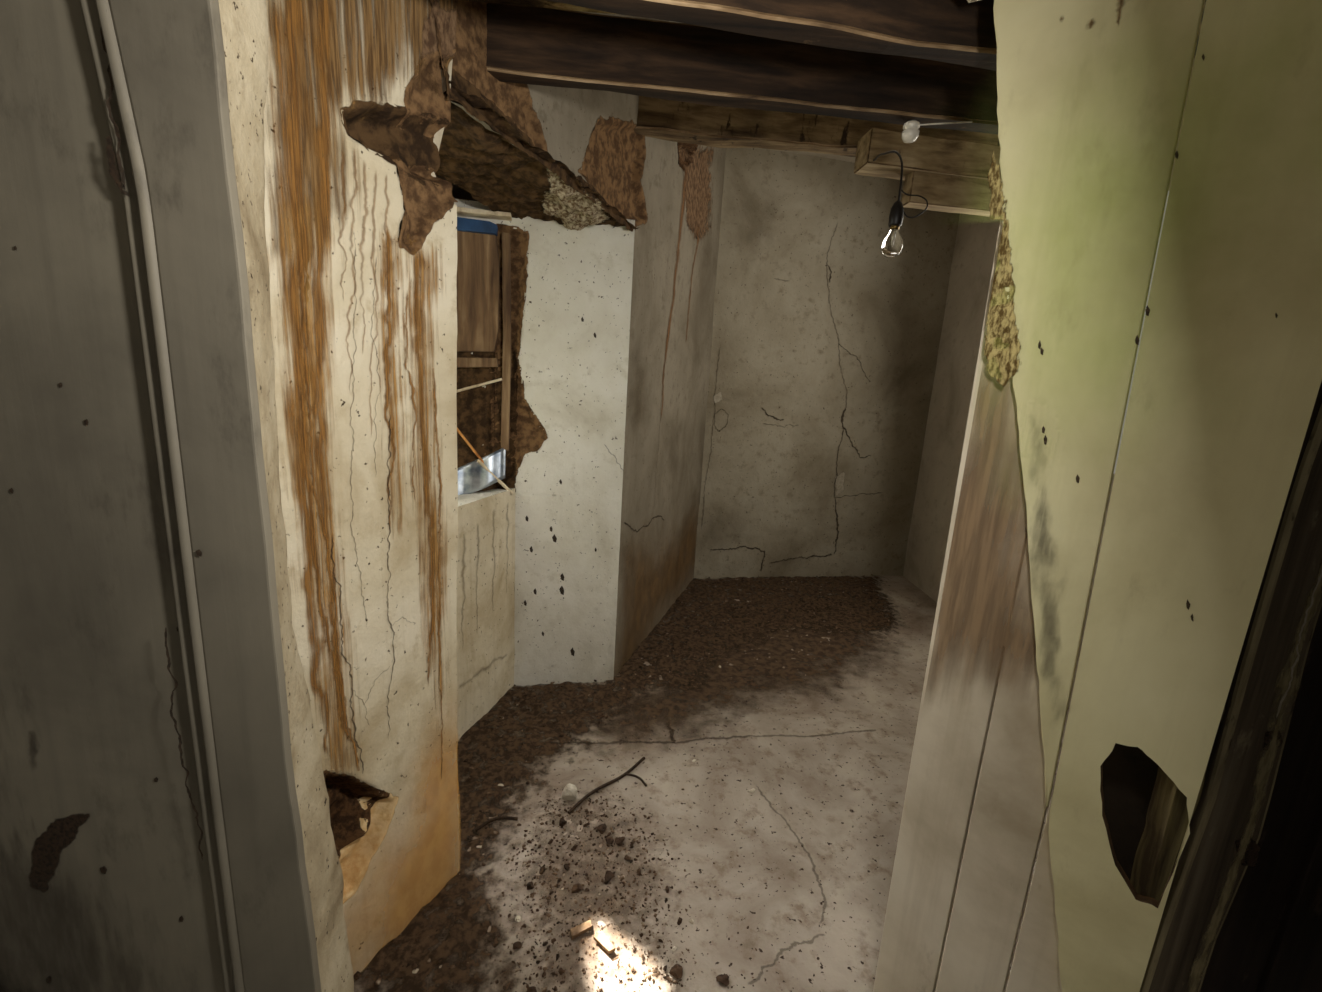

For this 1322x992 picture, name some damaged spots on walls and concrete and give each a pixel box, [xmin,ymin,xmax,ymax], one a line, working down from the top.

corrosion [271,0,359,771]
corrosion [381,231,447,778]
spalling [340,0,648,494]
corrosion [661,158,699,416]
crack [711,408,881,570]
peeling [29,814,90,892]
crack [164,627,203,857]
spalling [323,770,399,904]
crack [667,723,675,743]